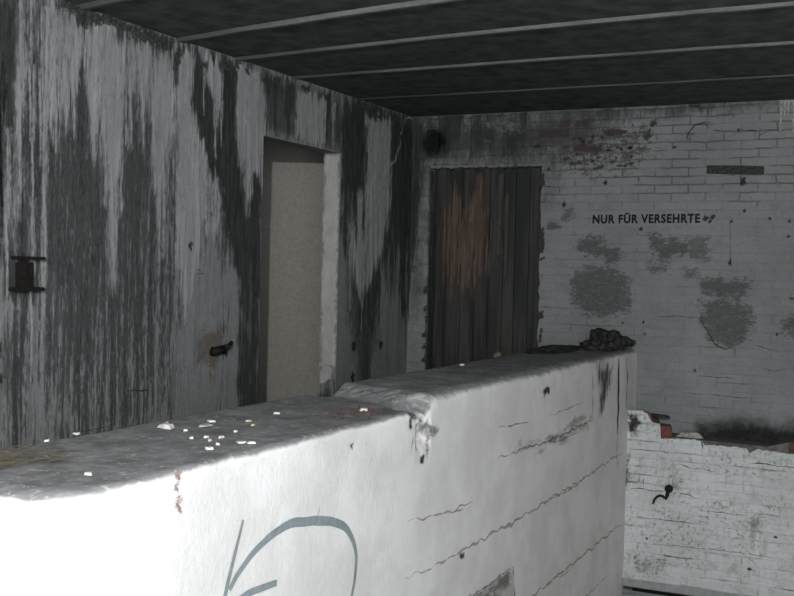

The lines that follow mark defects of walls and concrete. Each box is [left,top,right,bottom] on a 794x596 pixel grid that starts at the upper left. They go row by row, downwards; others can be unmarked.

damp [0,0,424,448]
rust [435,175,499,309]
crack [501,402,593,457]
crack [617,359,628,434]
flaking render [643,410,672,439]
crack [406,441,717,579]
crack [532,511,743,596]